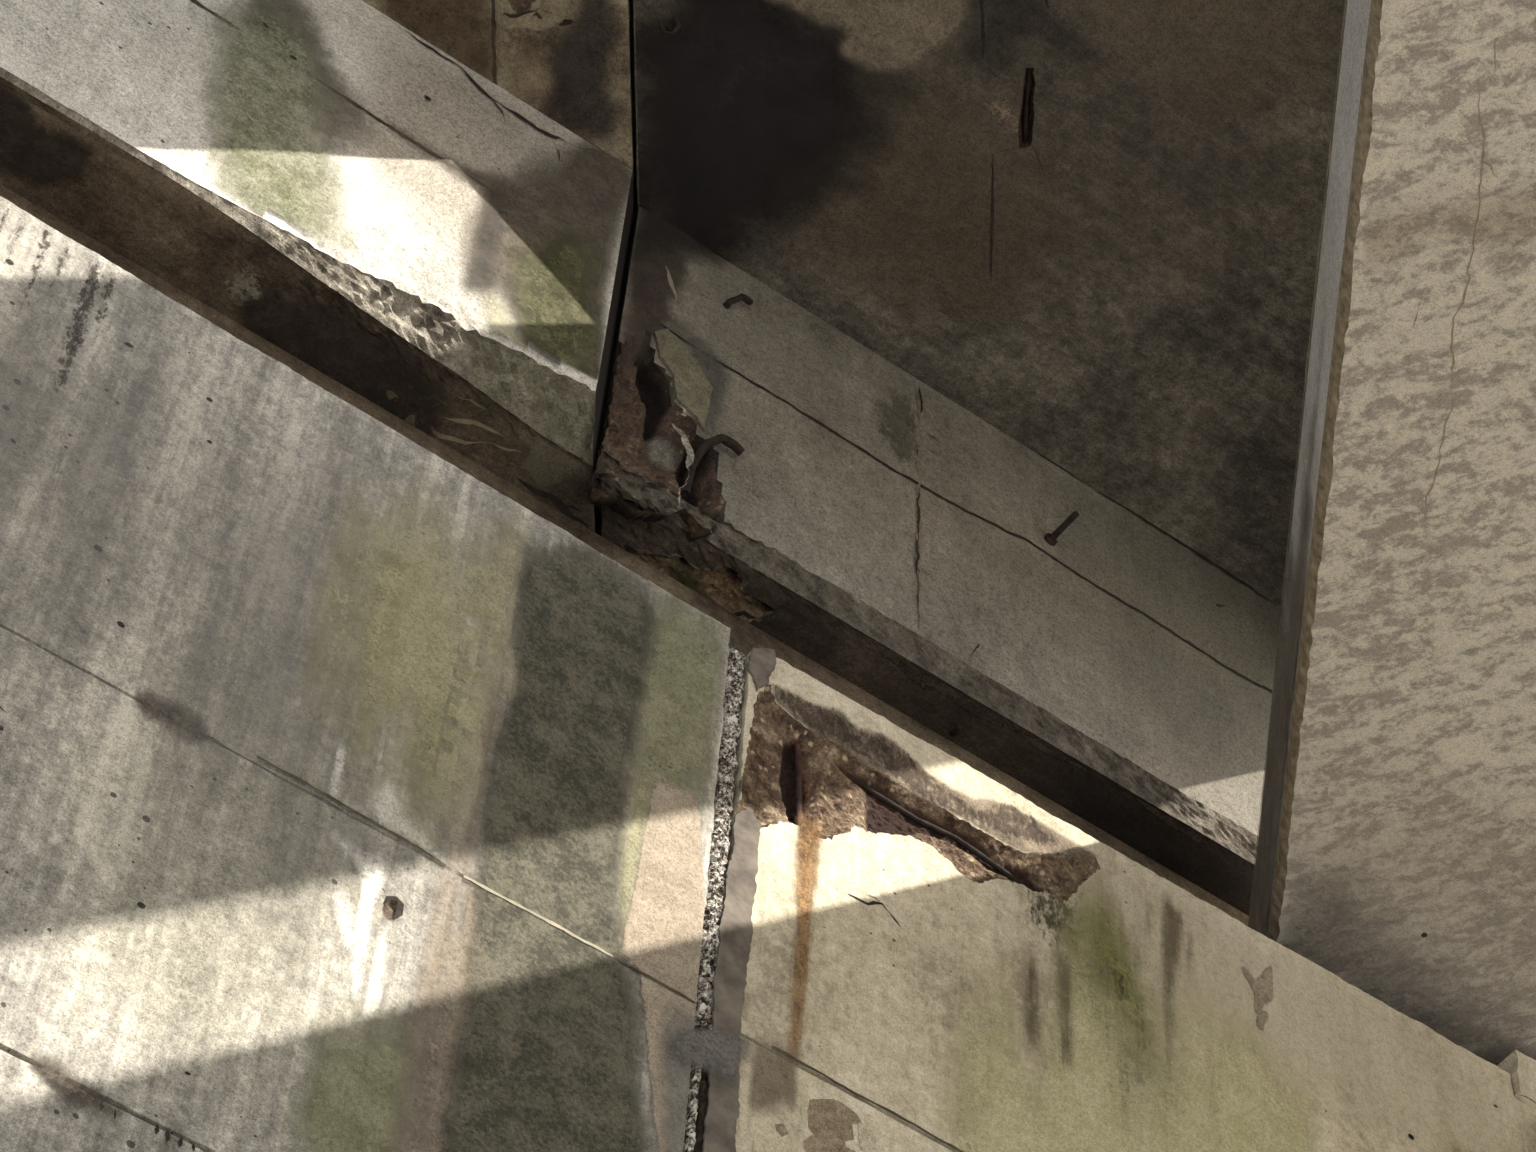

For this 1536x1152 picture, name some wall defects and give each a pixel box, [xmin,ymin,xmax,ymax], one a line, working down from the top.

peeling [501,0,574,31]
leakage [0,88,201,208]
leakage [25,230,70,298]
leakage [52,262,120,392]
spalling [587,328,775,621]
crack [901,380,939,634]
spalling [735,685,1101,903]
spalling [1134,796,1203,843]
rust [790,819,822,1056]
leakage [1028,876,1077,945]
leakage [1163,902,1181,1088]
peeling [775,1099,876,1152]